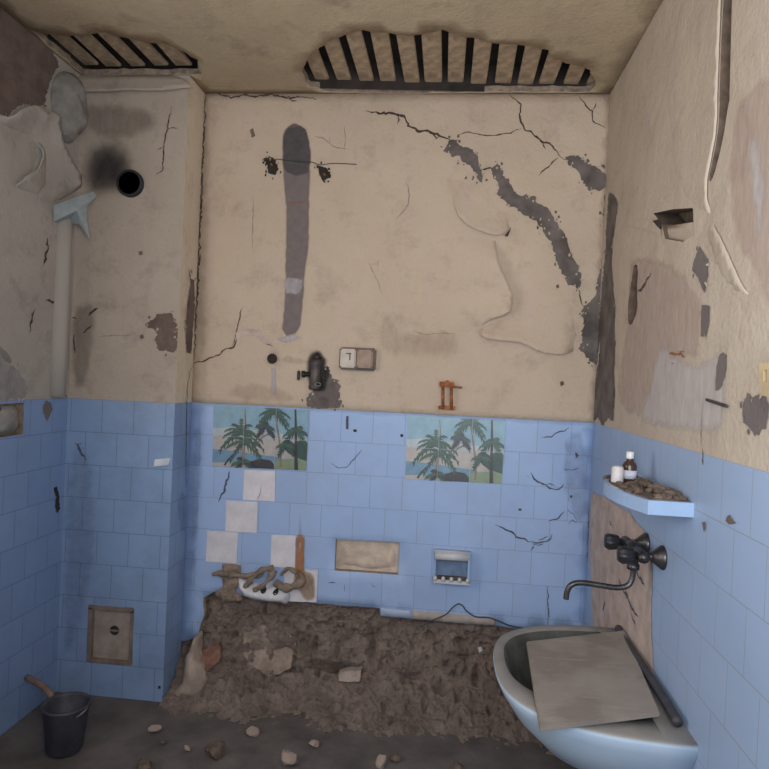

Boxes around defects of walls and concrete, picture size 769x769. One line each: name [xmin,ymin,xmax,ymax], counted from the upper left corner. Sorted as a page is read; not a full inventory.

peeling [0,7,59,117]
crack [368,94,566,174]
damp [278,124,310,342]
peeling [140,270,196,356]
peeling [565,154,726,429]
peeling [0,347,28,435]
peeling [740,392,768,436]
peeling [590,492,655,677]
spalling [158,592,555,756]